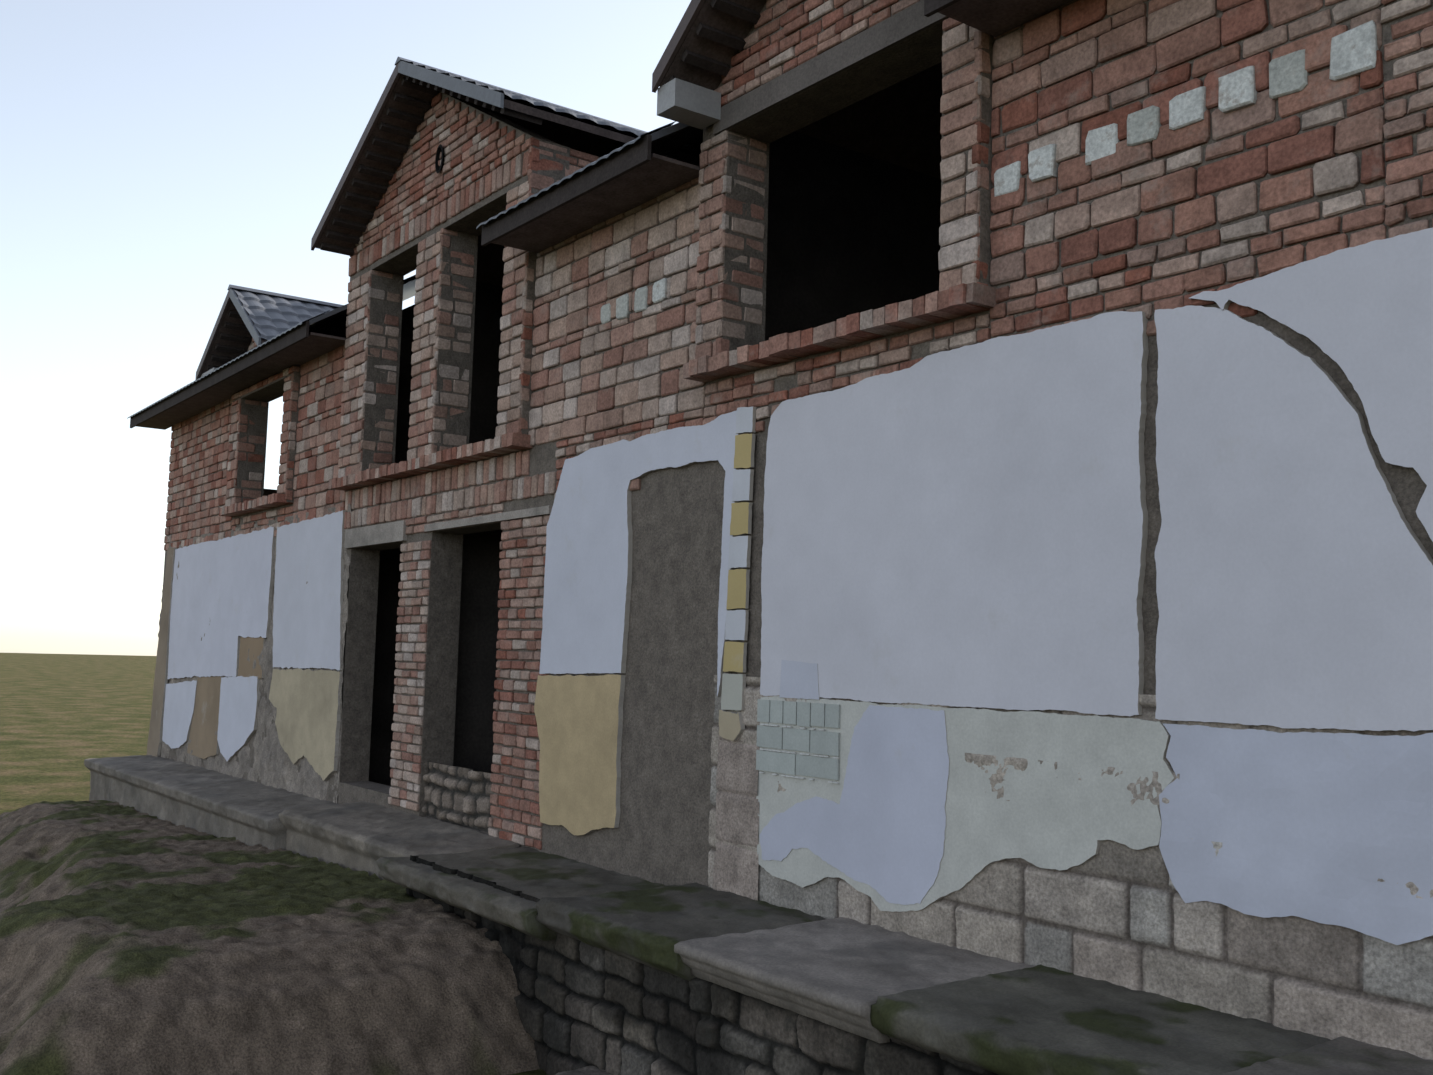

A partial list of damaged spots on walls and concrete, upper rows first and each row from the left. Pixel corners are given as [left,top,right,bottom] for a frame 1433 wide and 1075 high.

flaking render [187,637,265,759]